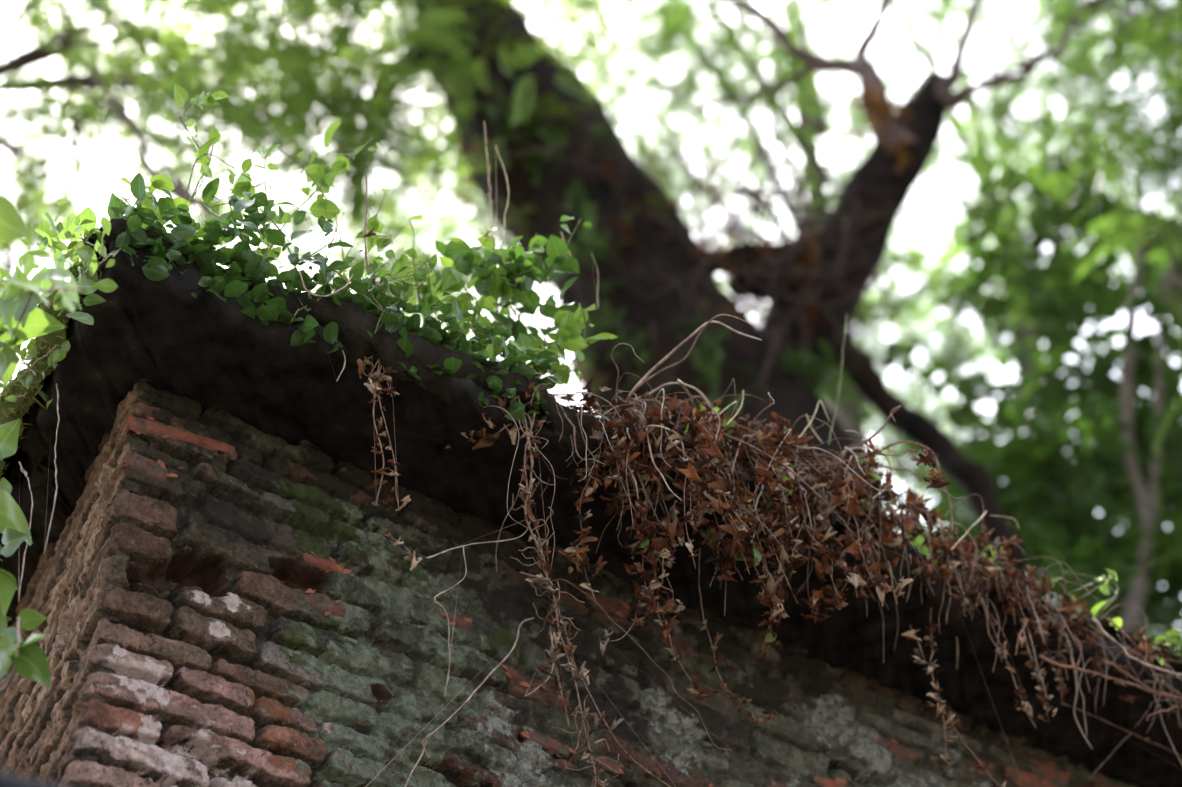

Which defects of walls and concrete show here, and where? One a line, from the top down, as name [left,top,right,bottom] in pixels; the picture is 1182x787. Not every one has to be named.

spalling [126,548,231,597]
water stain [143,389,851,753]